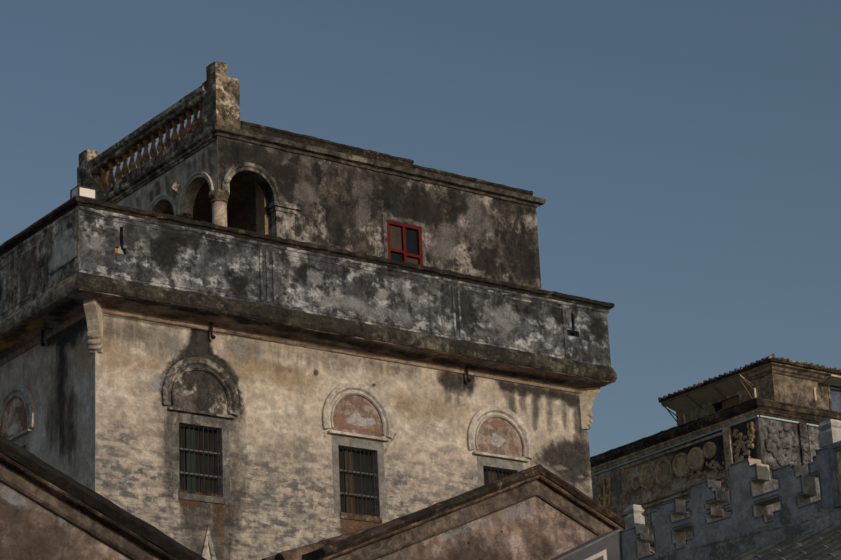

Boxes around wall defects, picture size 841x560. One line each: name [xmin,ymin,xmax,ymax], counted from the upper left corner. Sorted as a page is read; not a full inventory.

damp [380,177,468,225]
damp [252,243,349,283]
damp [470,207,536,285]
damp [225,271,251,296]
damp [501,291,539,317]
damp [550,302,605,338]
damp [46,317,91,451]
damp [160,328,284,428]
damp [437,371,476,391]
peeling [3,405,29,438]
peeling [333,400,379,433]
peeling [490,419,515,451]